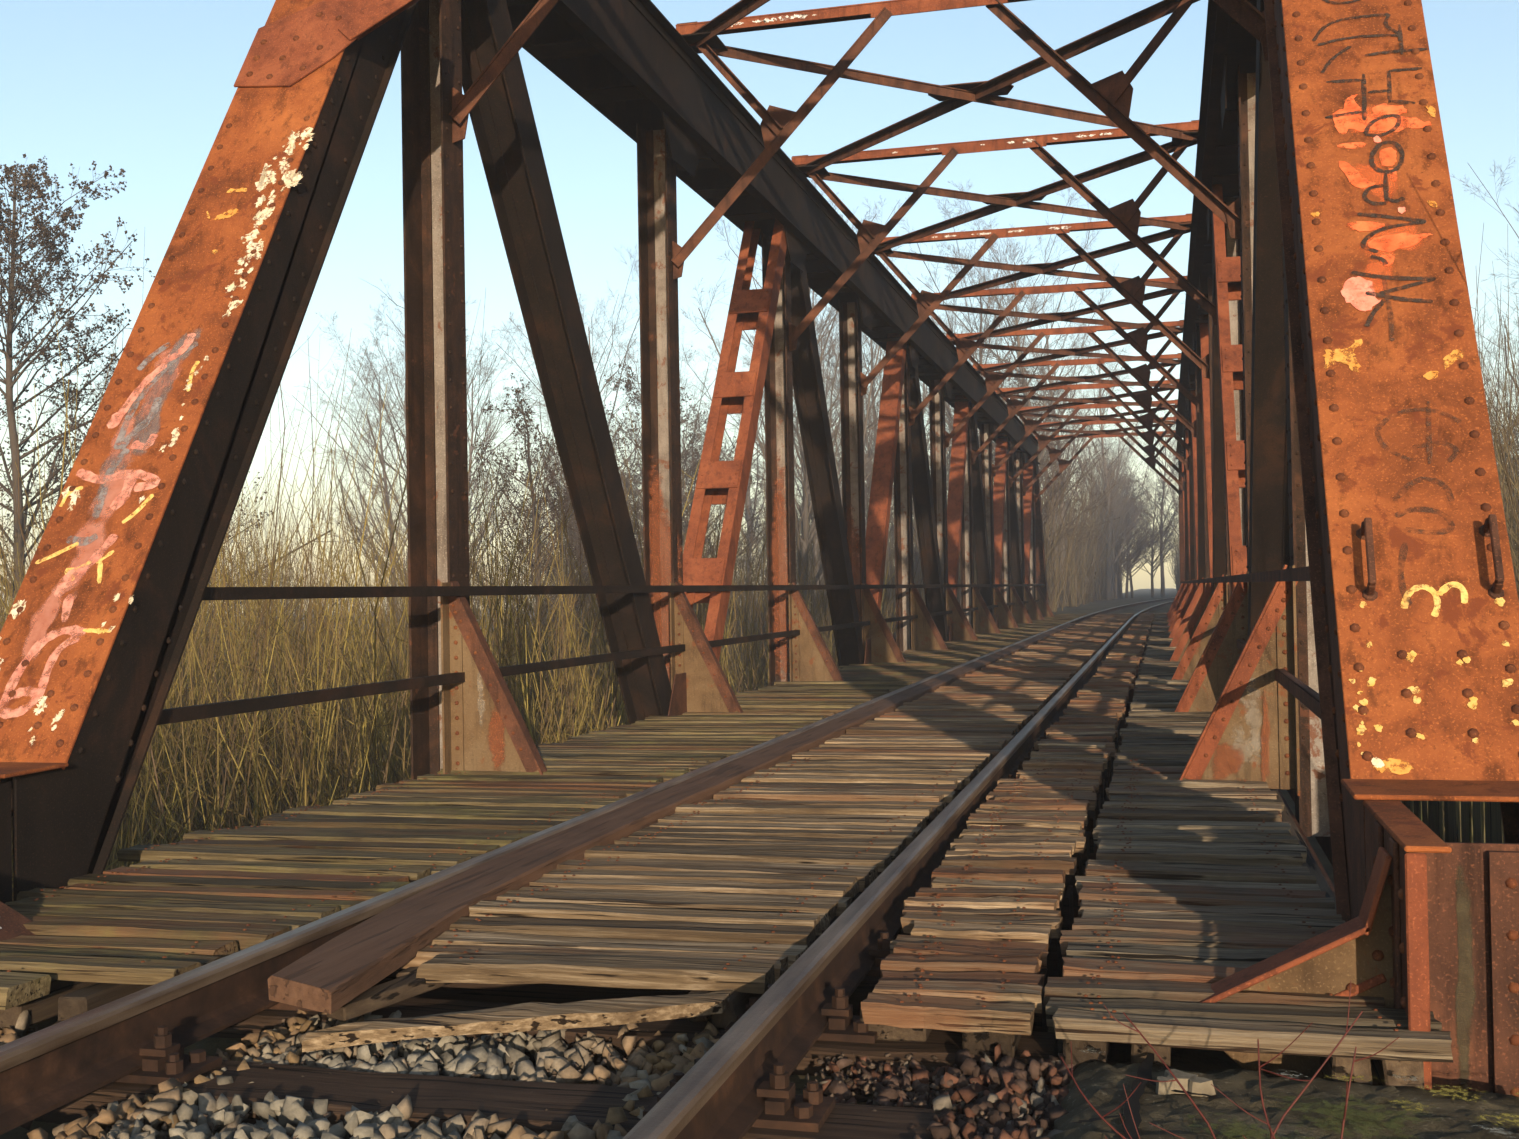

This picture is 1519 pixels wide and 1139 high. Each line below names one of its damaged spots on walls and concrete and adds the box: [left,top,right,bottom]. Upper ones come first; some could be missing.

peeling [206,127,315,317]
peeling [159,356,209,452]
peeling [62,486,80,512]
peeling [10,599,27,620]
corrosion [771,459,790,682]
peeling [28,695,65,744]
corrosion [1214,744,1243,780]
corrosion [1261,691,1270,782]
peeling [1349,670,1414,775]
corrosion [1456,867,1476,1091]
crack [1072,1053,1219,1139]